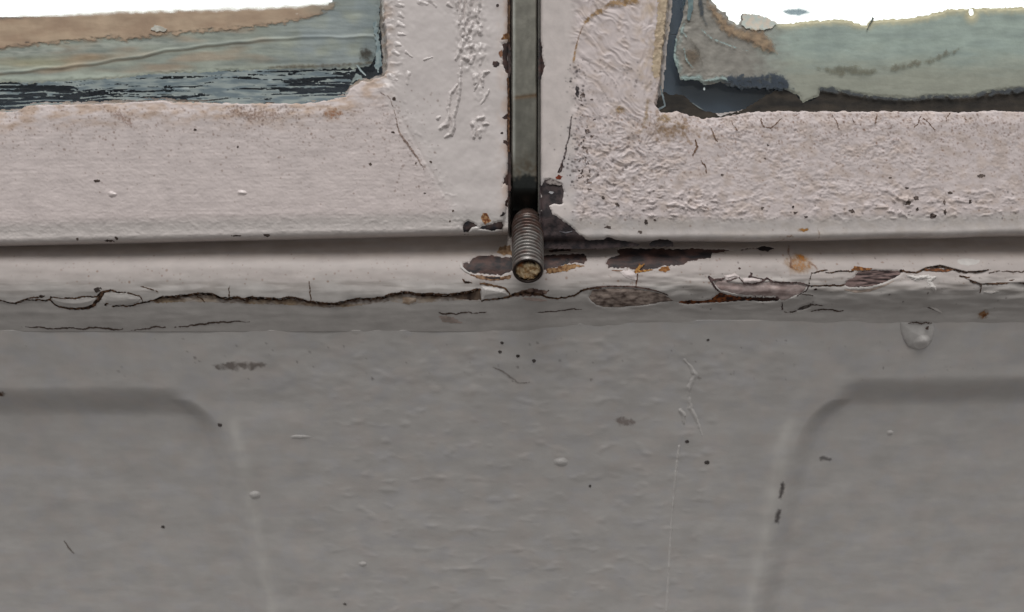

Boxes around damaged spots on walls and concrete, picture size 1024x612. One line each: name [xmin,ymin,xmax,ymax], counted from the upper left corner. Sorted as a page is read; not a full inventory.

peeling [742,14,777,30]
peeling [538,163,844,313]
peeling [460,245,512,281]
peeling [845,266,901,293]
crack [0,279,602,331]